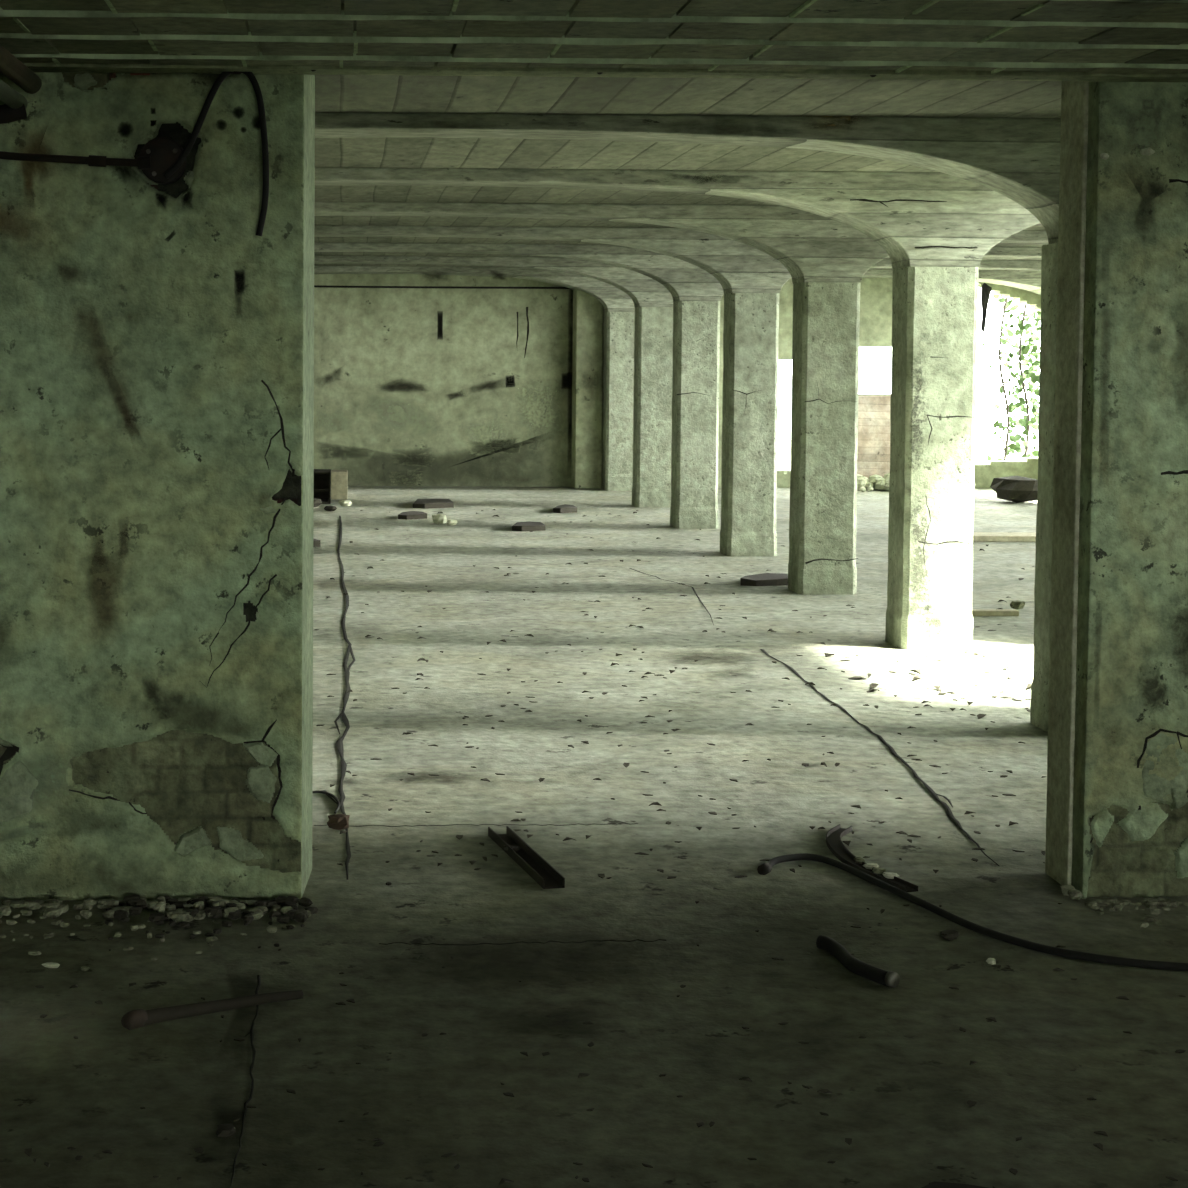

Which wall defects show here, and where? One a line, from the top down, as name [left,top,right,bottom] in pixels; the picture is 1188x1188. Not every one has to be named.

crack [202,380,295,688]
crack [630,568,714,625]
crack [1161,468,1188,476]
flaking render [70,730,301,873]
crack [314,516,638,879]
crack [760,649,999,866]
flaking render [1087,802,1188,898]
crack [1137,729,1188,768]